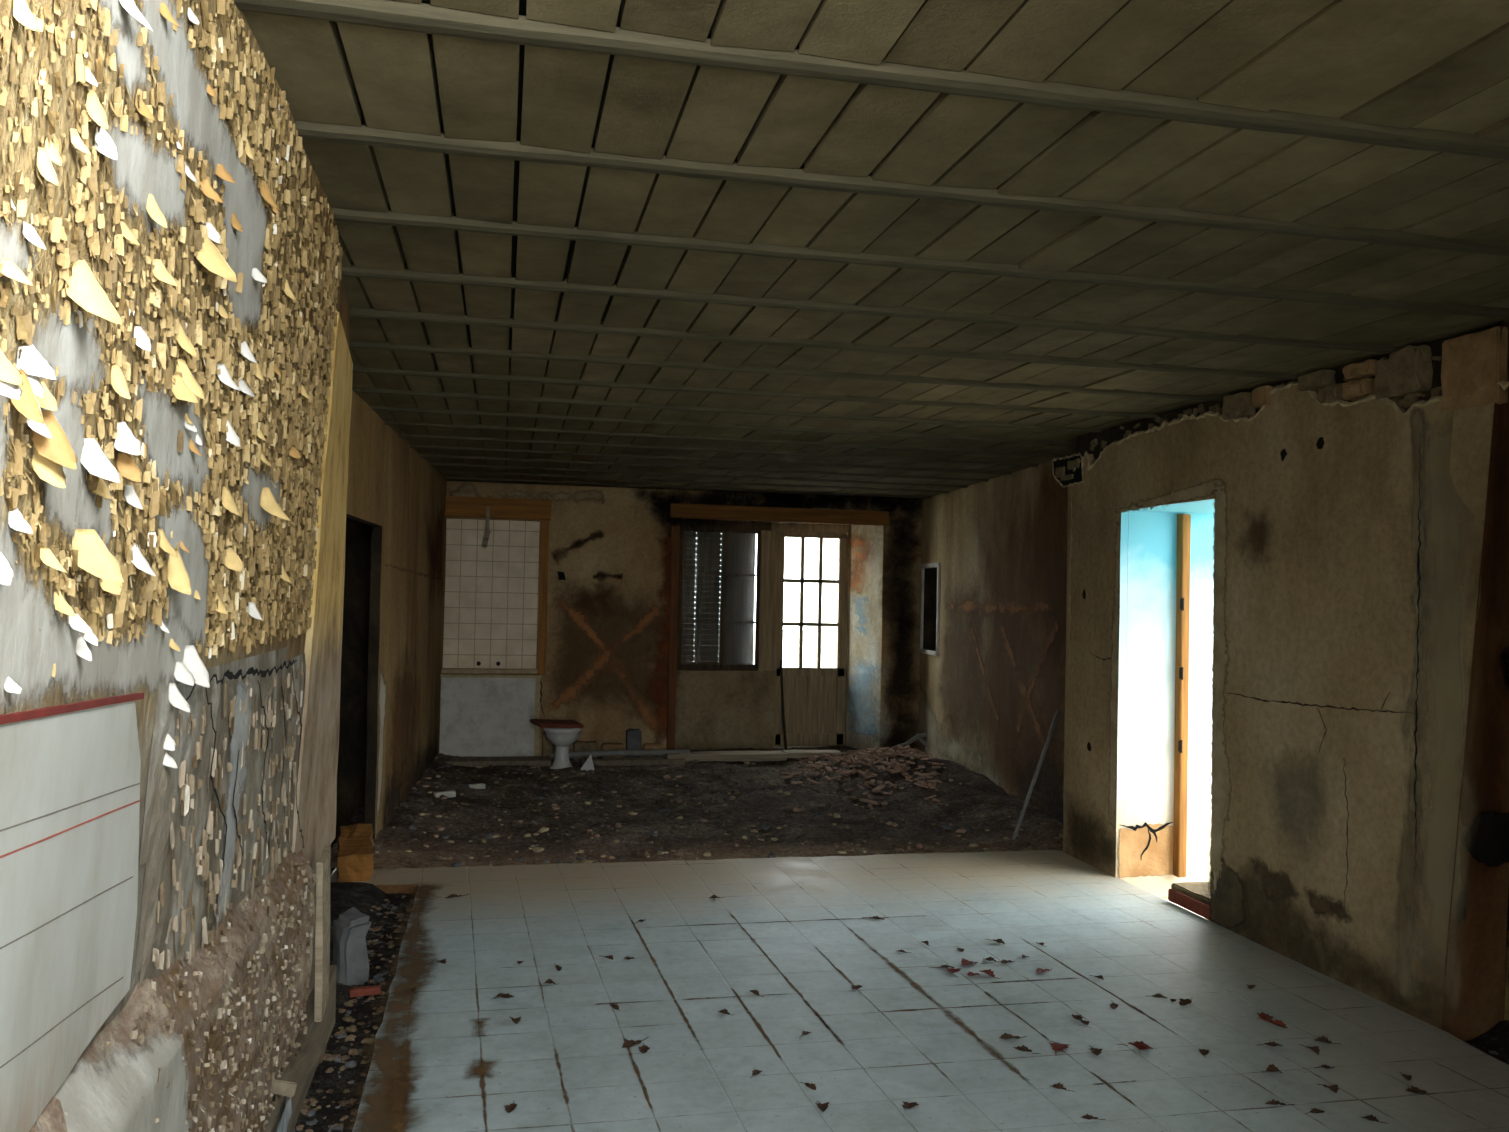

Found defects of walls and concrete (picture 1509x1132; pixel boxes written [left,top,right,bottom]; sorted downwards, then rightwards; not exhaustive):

peeling [0,0,343,991]
corrosion [552,596,662,729]
spalling [1052,326,1509,1000]
crack [1225,692,1413,910]
peeling [277,1097,292,1132]
damp [354,885,440,1132]
damp [469,1059,494,1132]
damp [555,1051,569,1104]
damp [1206,872,1444,1030]